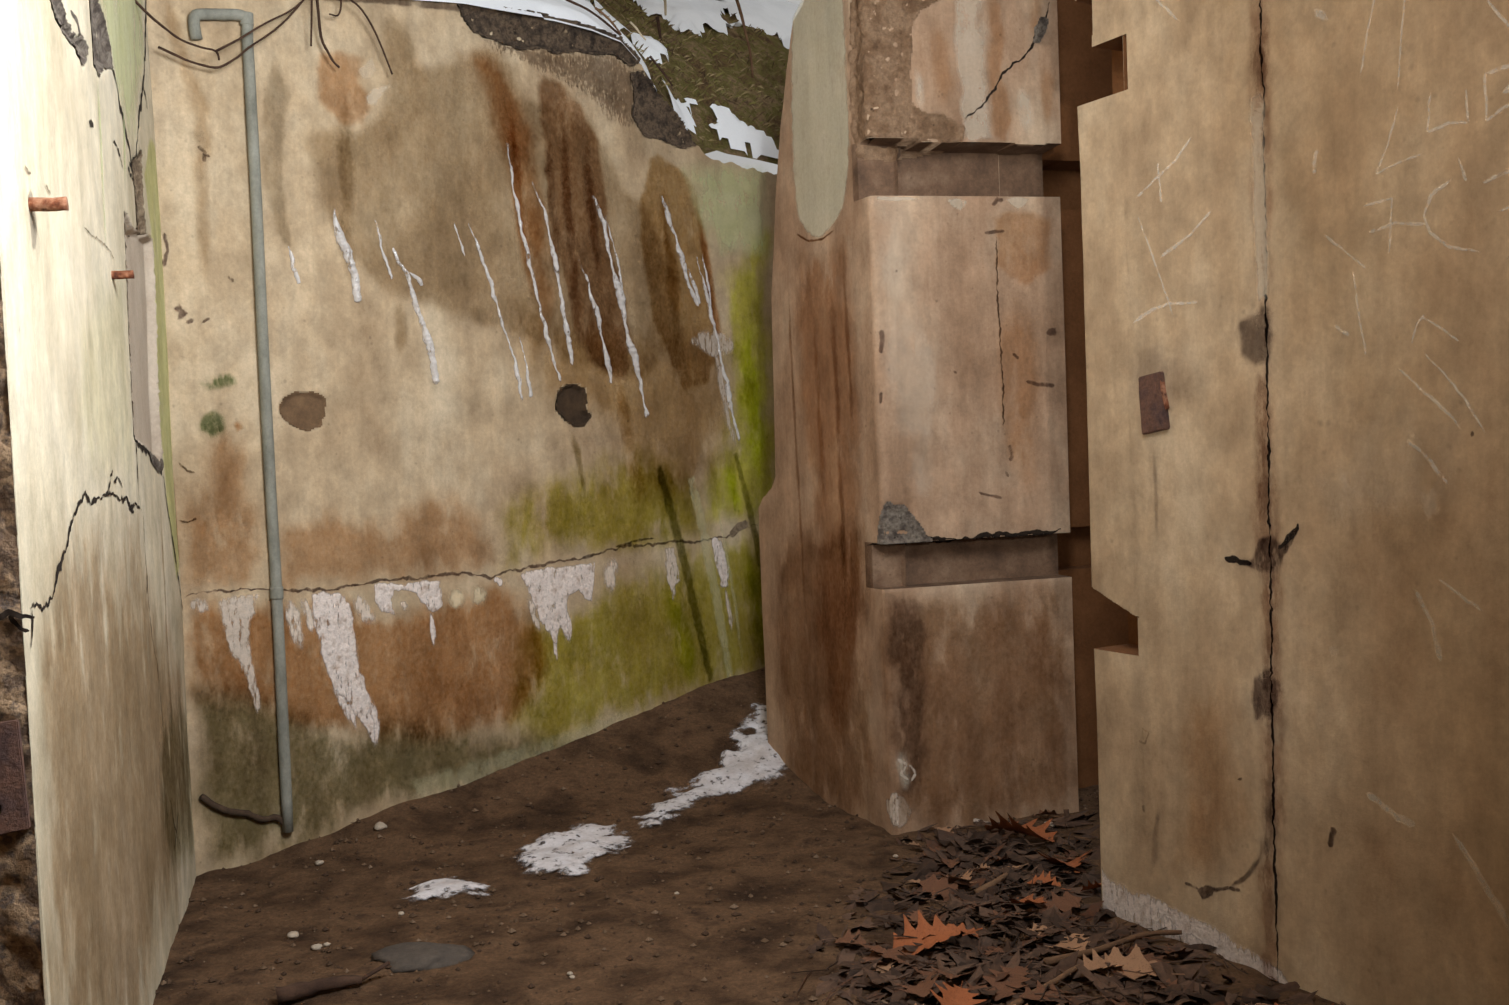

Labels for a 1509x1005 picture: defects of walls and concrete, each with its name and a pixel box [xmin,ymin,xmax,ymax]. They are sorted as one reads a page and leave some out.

crack [965,2,1050,119]
water stain [454,224,533,398]
water stain [507,148,574,380]
water stain [583,271,612,383]
water stain [595,198,649,416]
water stain [662,196,740,440]
crack [0,438,183,719]
crack [217,520,748,593]
water stain [665,533,690,596]
efflorescence [712,537,732,627]
spalling [877,501,932,544]
crack [1225,1,1299,973]